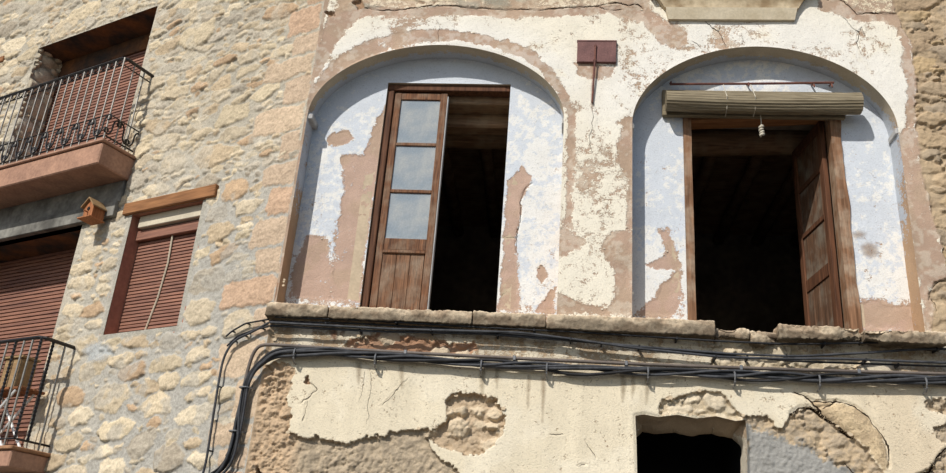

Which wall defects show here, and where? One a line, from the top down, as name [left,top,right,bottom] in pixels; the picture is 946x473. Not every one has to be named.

crack [364,2,642,39]
crack [841,0,893,48]
peeling [296,0,687,256]
peeling [274,109,385,301]
peeling [498,167,532,310]
peeling [536,117,682,316]
spalling [245,361,506,473]
spalling [658,389,883,473]
crack [790,392,889,465]
spalling [923,397,946,473]
crack [923,448,946,473]